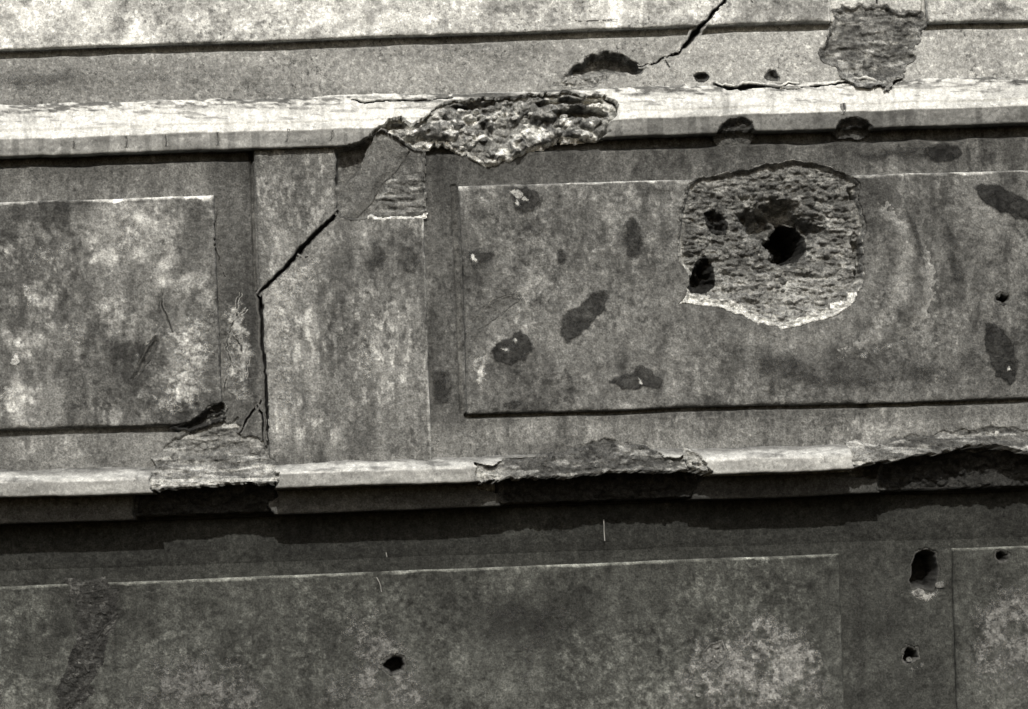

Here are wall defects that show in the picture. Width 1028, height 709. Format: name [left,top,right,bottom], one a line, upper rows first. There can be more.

crack [568,17,618,25]
crack [637,0,754,73]
flaking render [818,3,929,92]
spalling [333,51,644,221]
spalling [704,210,728,235]
spalling [687,255,715,294]
flaking render [150,305,279,491]
spalling [474,438,712,492]
spalling [845,425,1028,478]